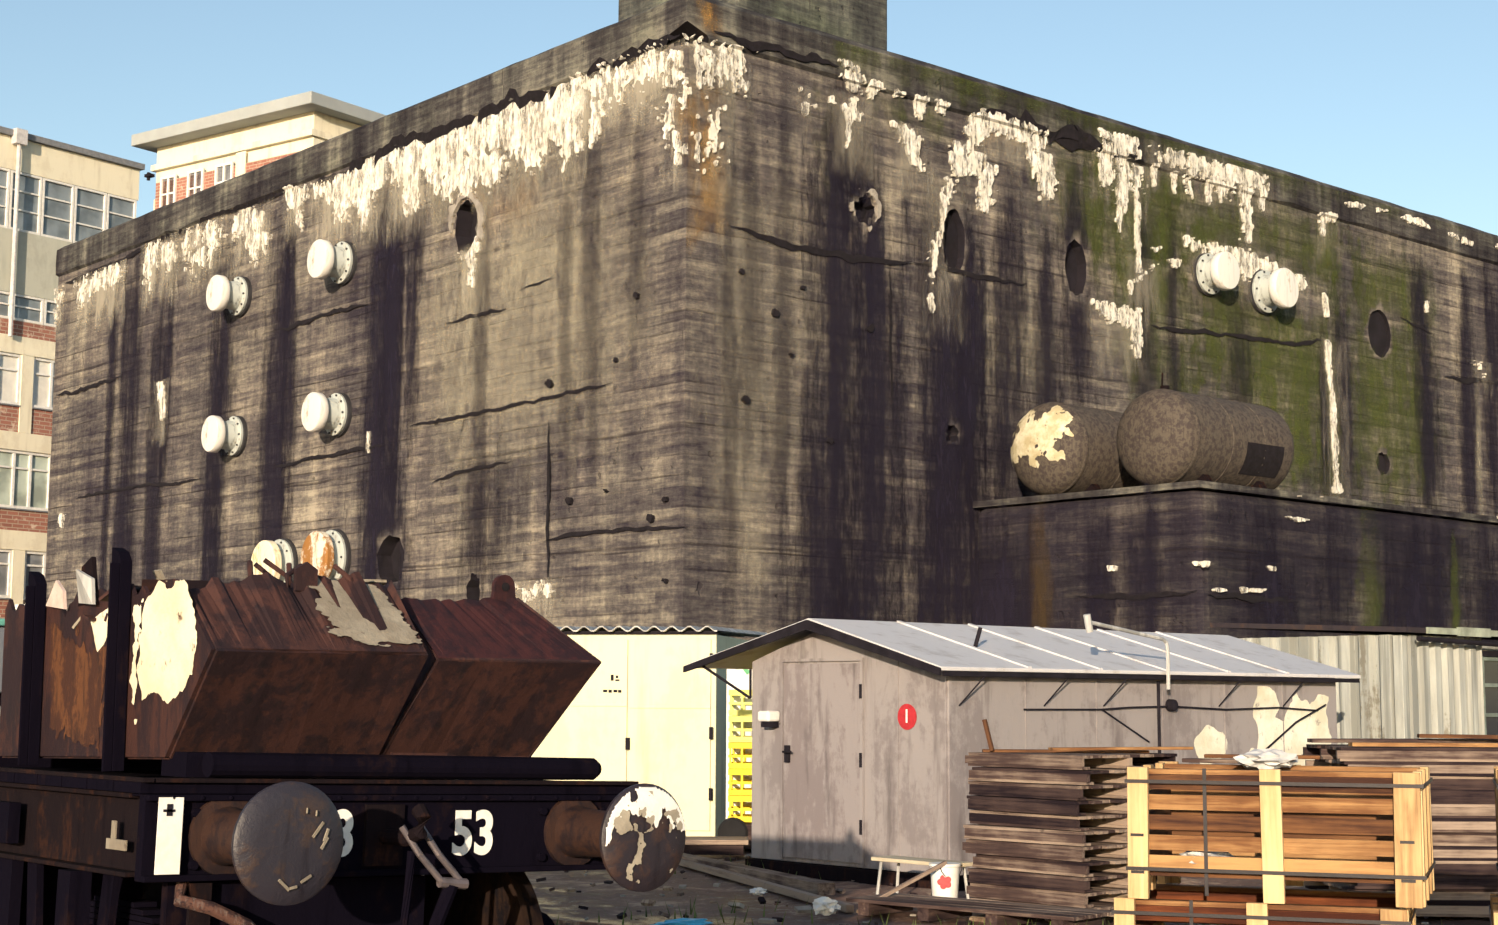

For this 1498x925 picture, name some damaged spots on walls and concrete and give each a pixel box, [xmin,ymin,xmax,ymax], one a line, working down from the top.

crack [66,31,839,284]
leakage [99,283,172,589]
leakage [200,449,225,580]
leakage [208,309,232,421]
leakage [254,238,297,549]
leakage [358,193,421,595]
crack [728,225,1027,417]
leakage [787,101,1438,638]
leakage [1367,528,1458,635]
leakage [1460,265,1498,516]
leakage [1479,554,1498,642]